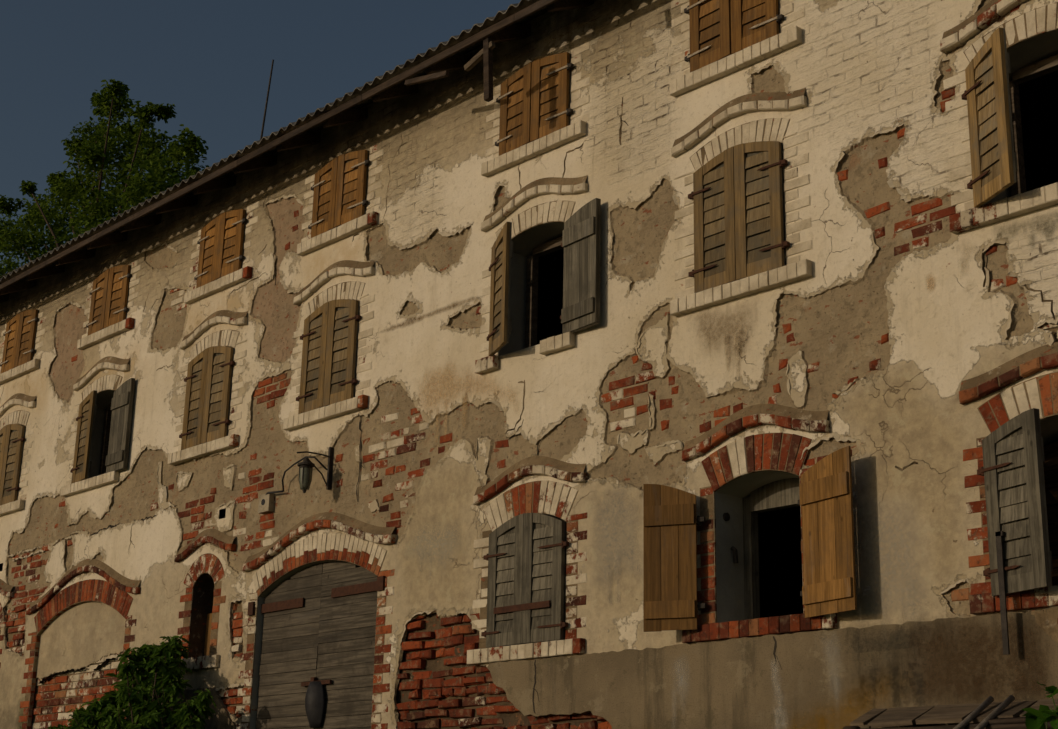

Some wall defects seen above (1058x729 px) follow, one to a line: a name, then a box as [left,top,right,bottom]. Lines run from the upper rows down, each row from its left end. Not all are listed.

spalling [2,194,588,657]
spalling [589,124,956,489]
spalling [982,240,1058,346]
spalling [395,610,612,729]